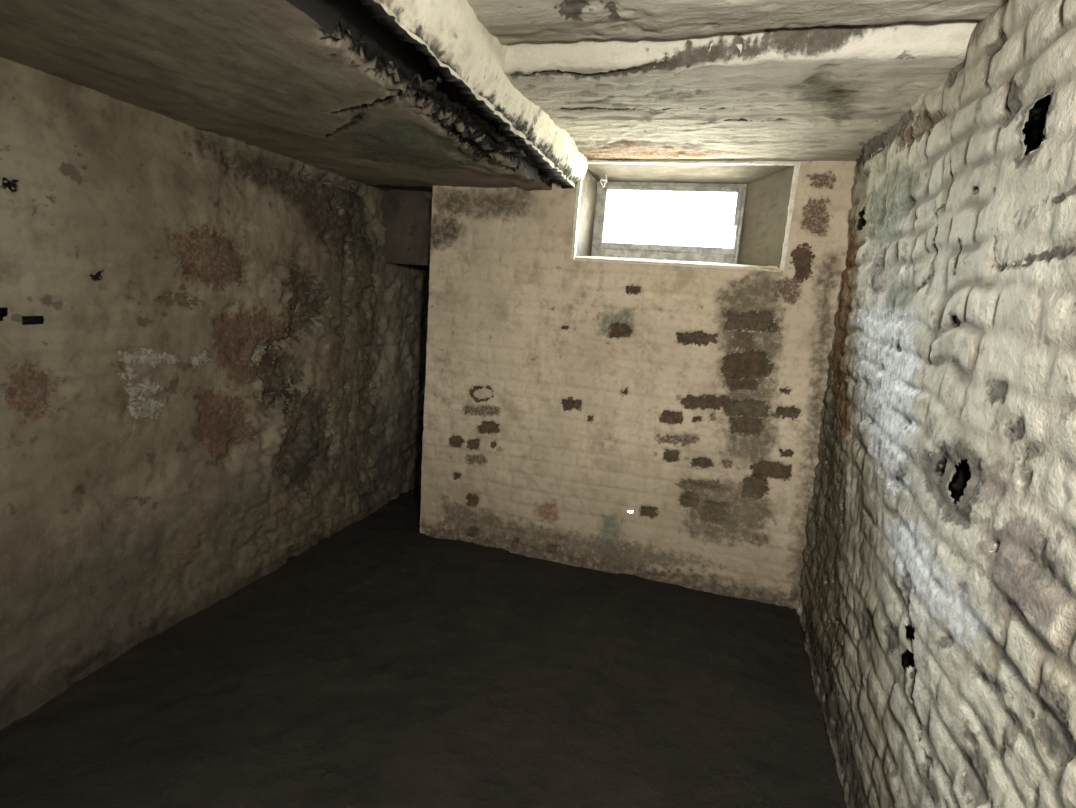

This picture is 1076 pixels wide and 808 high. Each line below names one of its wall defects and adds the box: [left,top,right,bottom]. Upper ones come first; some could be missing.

spalling [987,29,1007,56]
water stain [414,25,580,186]
water stain [789,76,852,122]
spalling [1000,77,1056,167]
water stain [580,141,747,161]
spalling [22,316,42,325]
spalling [986,381,1007,404]
water stain [423,272,920,808]
spalling [920,417,1072,631]
water stain [888,520,985,646]
spalling [861,608,899,654]
spalling [937,634,954,648]